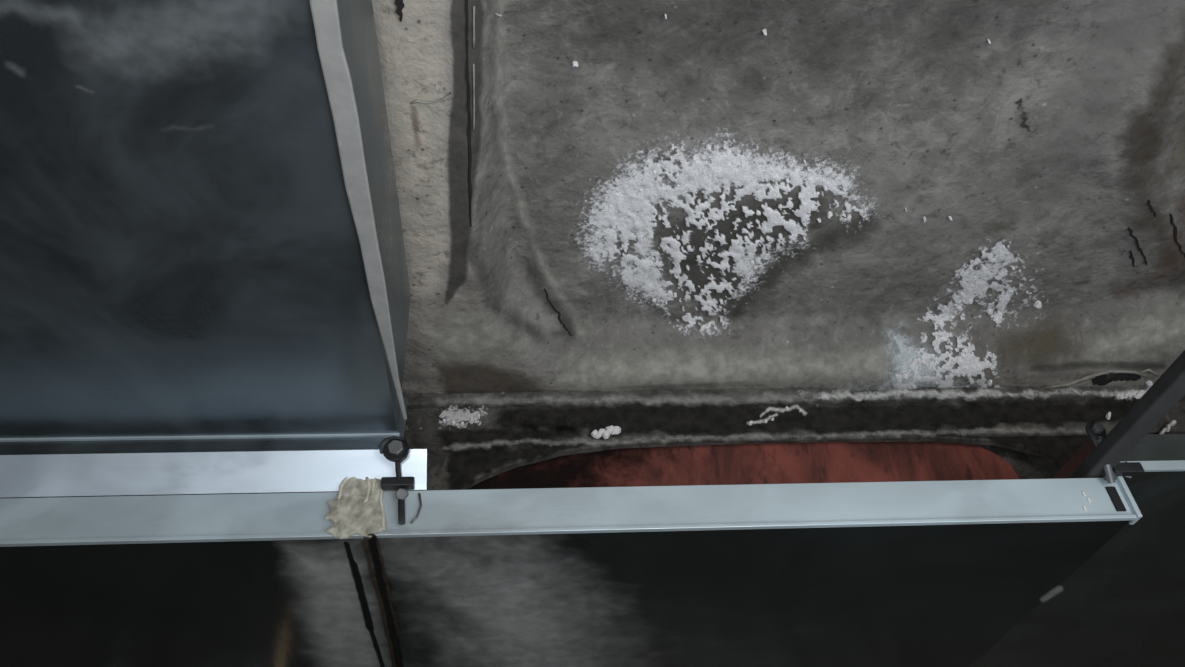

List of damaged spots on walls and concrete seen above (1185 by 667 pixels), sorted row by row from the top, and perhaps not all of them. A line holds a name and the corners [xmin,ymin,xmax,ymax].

leakage [446,0,482,303]
crack [544,289,573,336]
leakage [575,133,874,336]
leakage [437,239,1164,490]
leakage [1064,318,1185,367]
crack [1128,200,1185,267]